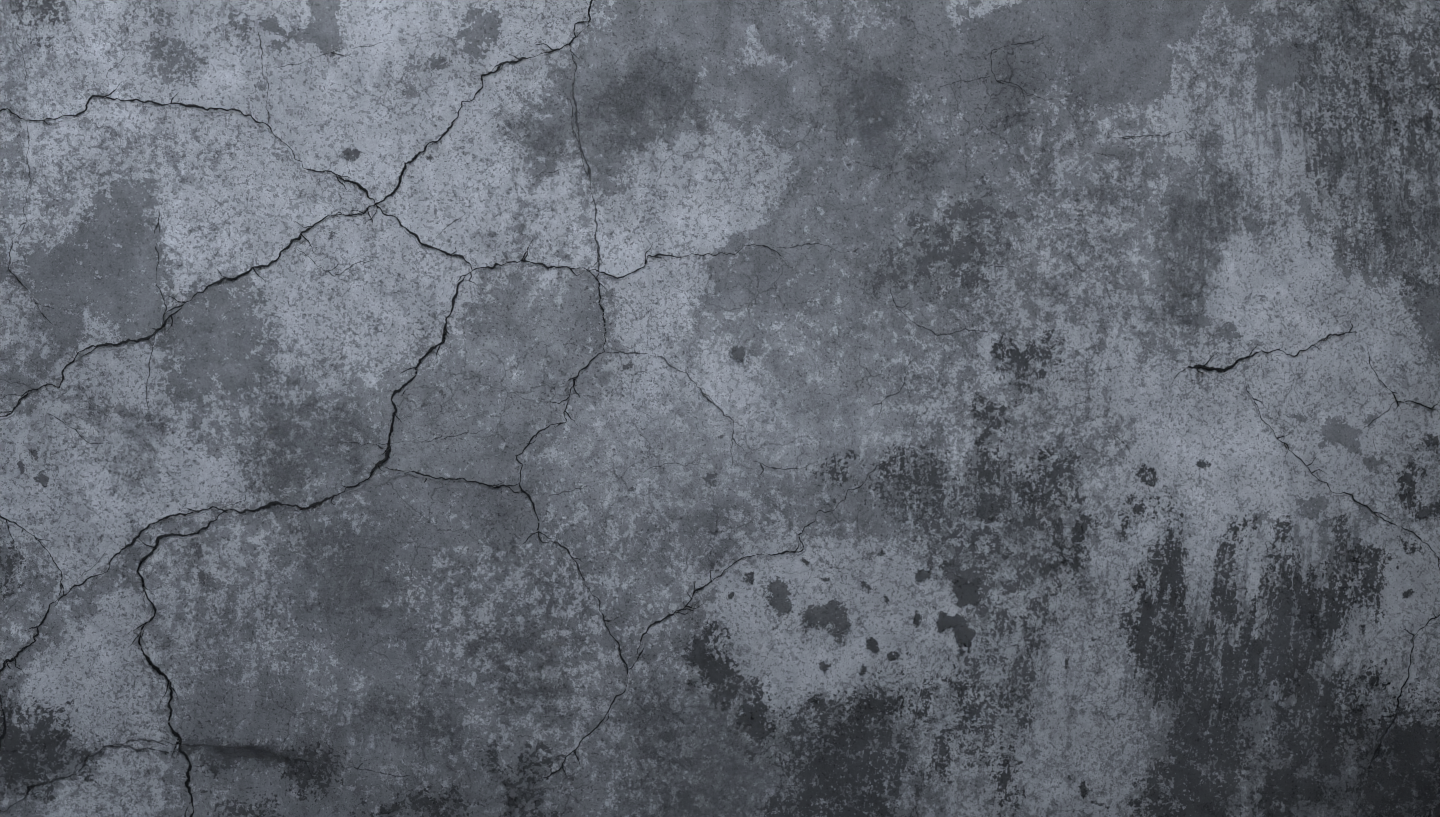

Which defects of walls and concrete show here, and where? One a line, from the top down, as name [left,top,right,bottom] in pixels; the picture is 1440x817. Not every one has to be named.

crack [0,0,992,817]
crack [1169,317,1440,570]
crack [1366,614,1440,781]